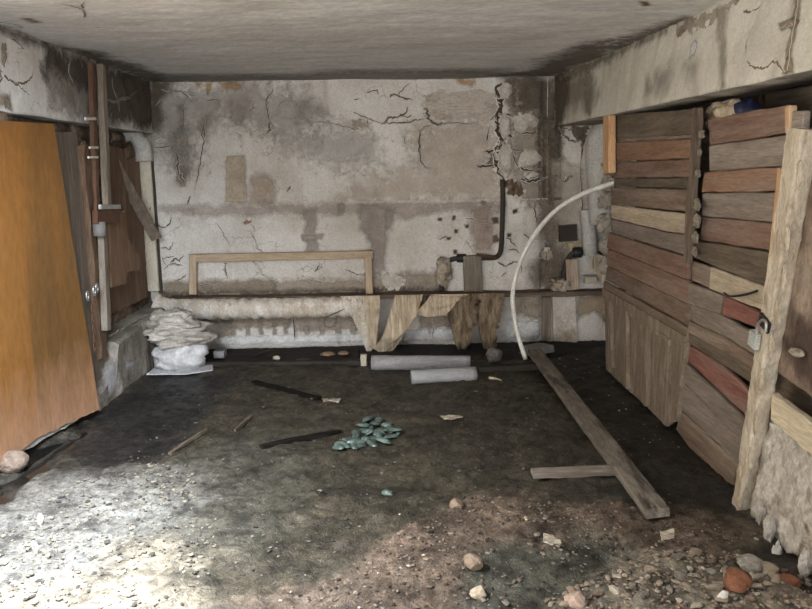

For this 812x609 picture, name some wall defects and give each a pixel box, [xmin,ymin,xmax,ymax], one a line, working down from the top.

crack [62,2,87,18]
spalling [676,0,739,38]
crack [745,0,798,73]
crack [0,37,34,95]
leakage [0,18,687,341]
crack [154,81,584,294]
leakage [201,316,362,345]